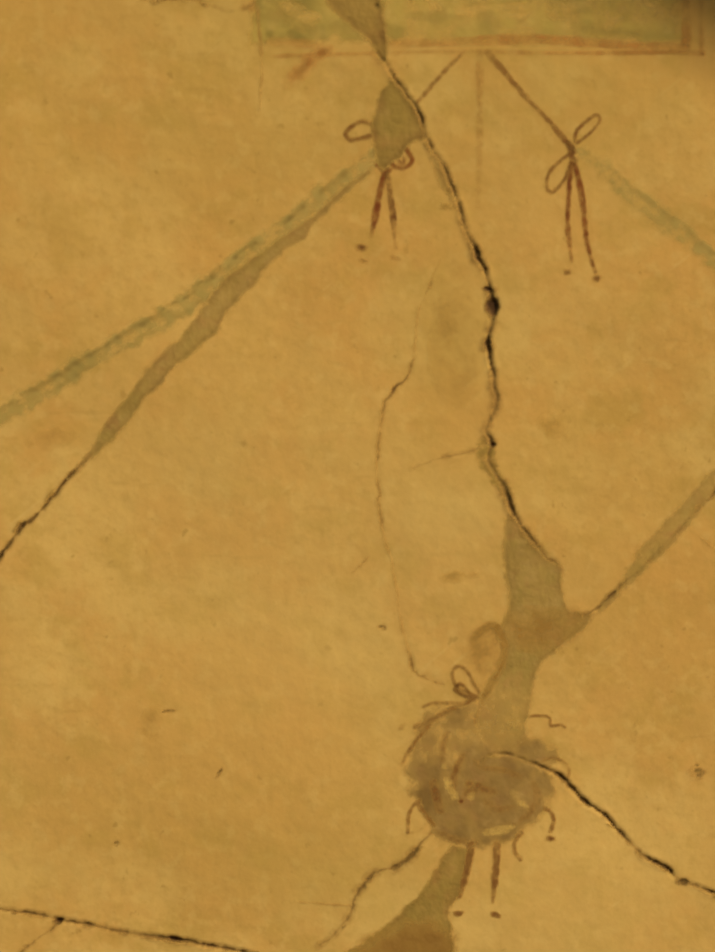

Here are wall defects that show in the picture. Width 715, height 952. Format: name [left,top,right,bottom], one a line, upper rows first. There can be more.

crack [377,57,555,562]
crack [0,468,78,558]
crack [584,580,627,616]
crack [409,654,437,683]
crack [480,753,715,897]
crack [0,908,247,952]
crack [320,833,431,945]
damp [355,921,454,952]